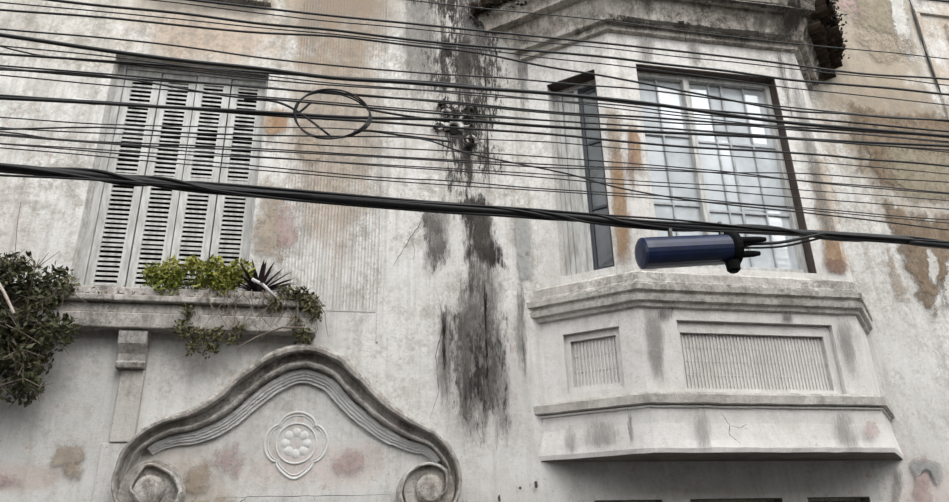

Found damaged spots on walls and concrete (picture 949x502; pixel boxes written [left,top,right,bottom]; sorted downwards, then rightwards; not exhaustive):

water stain [407,0,528,429]
peeling [848,102,949,317]
peeling [911,459,942,502]